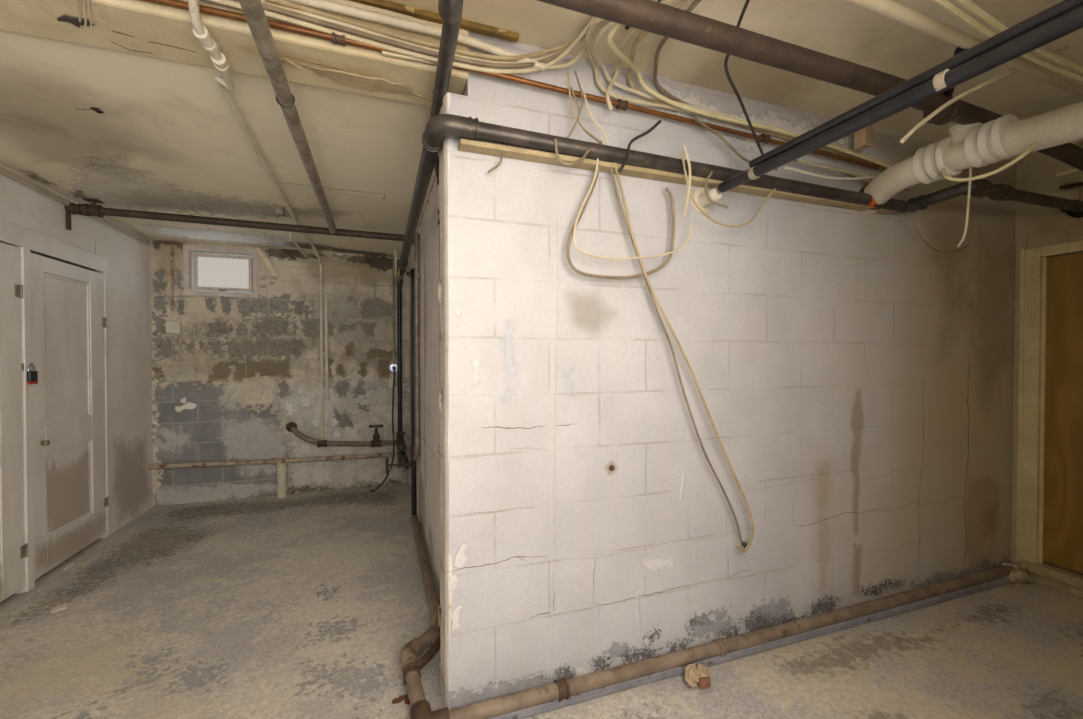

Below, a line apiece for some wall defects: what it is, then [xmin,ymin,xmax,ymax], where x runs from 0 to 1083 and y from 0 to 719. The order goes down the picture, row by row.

peeling [151,268,397,506]
damp [861,558,1010,598]
damp [588,594,840,672]